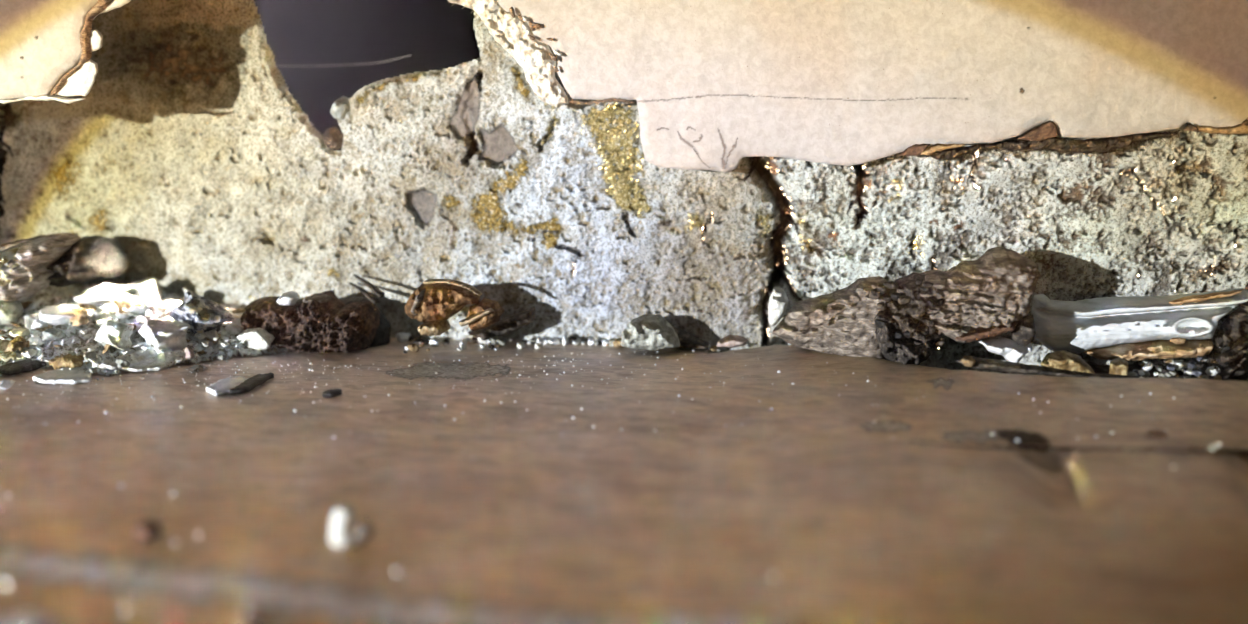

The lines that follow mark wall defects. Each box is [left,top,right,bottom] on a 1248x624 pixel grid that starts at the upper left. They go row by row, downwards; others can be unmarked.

spalling [253,0,568,165]
crack [570,97,634,105]
spalling [407,190,437,228]
crack [624,212,635,236]
crack [657,96,803,347]
crack [559,245,581,274]
peeling [33,348,185,385]